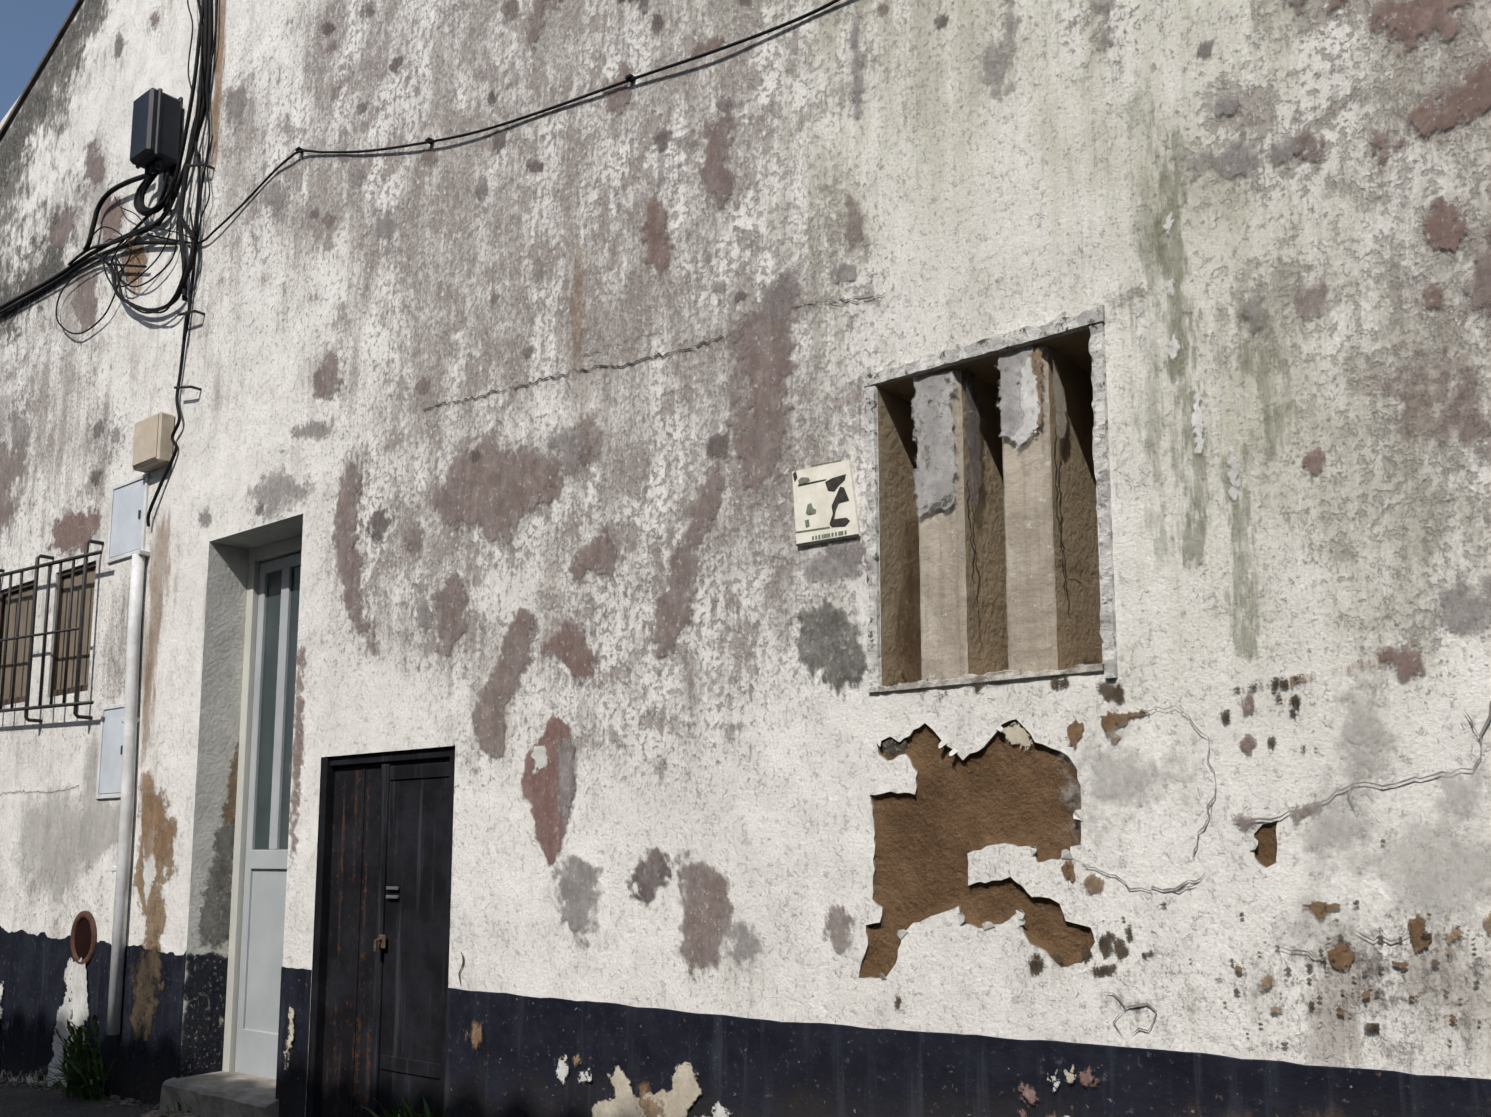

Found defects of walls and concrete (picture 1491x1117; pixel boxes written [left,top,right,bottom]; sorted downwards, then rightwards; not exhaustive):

leakage [0,0,105,196]
leakage [0,207,77,347]
peeling [923,369,982,512]
peeling [1011,349,1068,448]
leakage [787,596,867,699]
peeling [1050,656,1101,689]
peeling [133,773,178,953]
spalling [823,682,1150,979]
crack [1083,701,1491,892]
spalling [1327,942,1356,970]
spalling [1407,913,1463,955]
peeling [556,1053,733,1117]